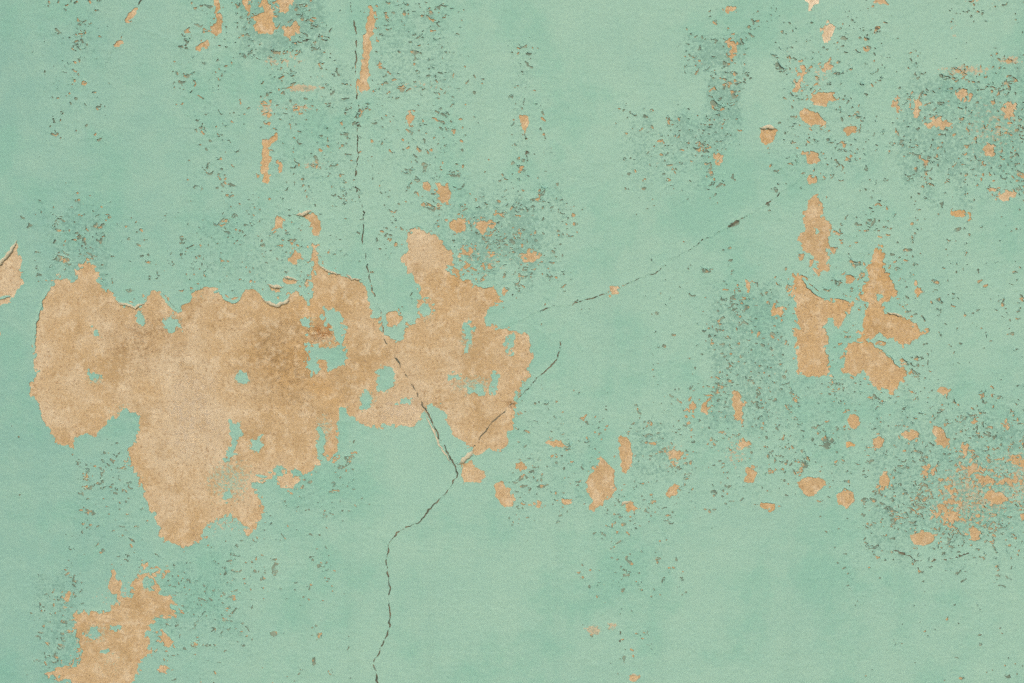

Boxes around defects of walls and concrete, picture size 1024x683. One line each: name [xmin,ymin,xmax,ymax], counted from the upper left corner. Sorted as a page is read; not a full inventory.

crack [276,2,376,297]
peeling [632,6,756,198]
peeling [0,239,24,305]
peeling [29,0,640,548]
peeling [684,0,1024,509]
crack [474,342,561,446]
crack [373,326,458,683]
peeling [754,498,780,512]
peeling [44,562,183,683]